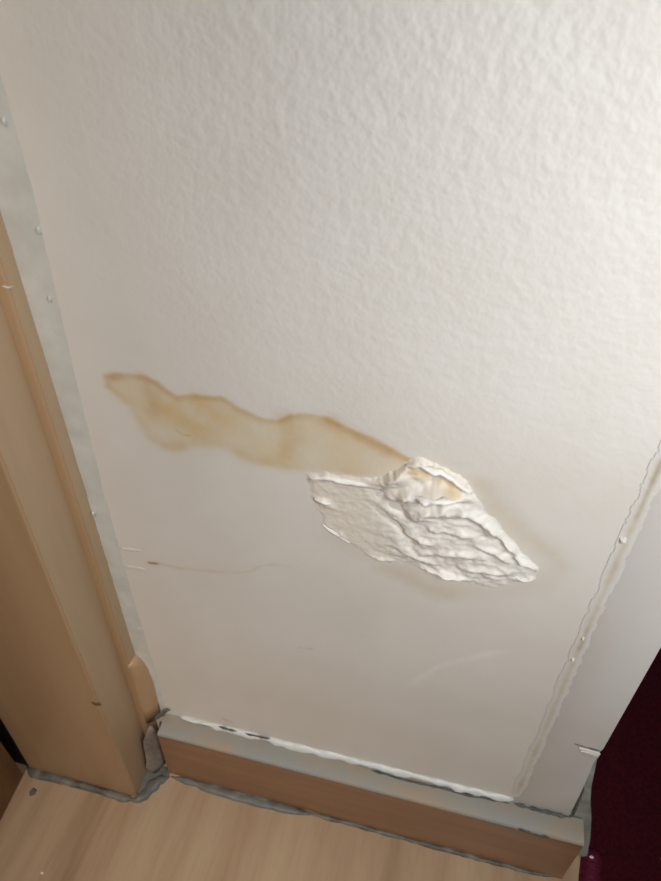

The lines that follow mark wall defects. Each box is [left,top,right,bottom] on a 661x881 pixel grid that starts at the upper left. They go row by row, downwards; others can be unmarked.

damp [98,364,588,612]